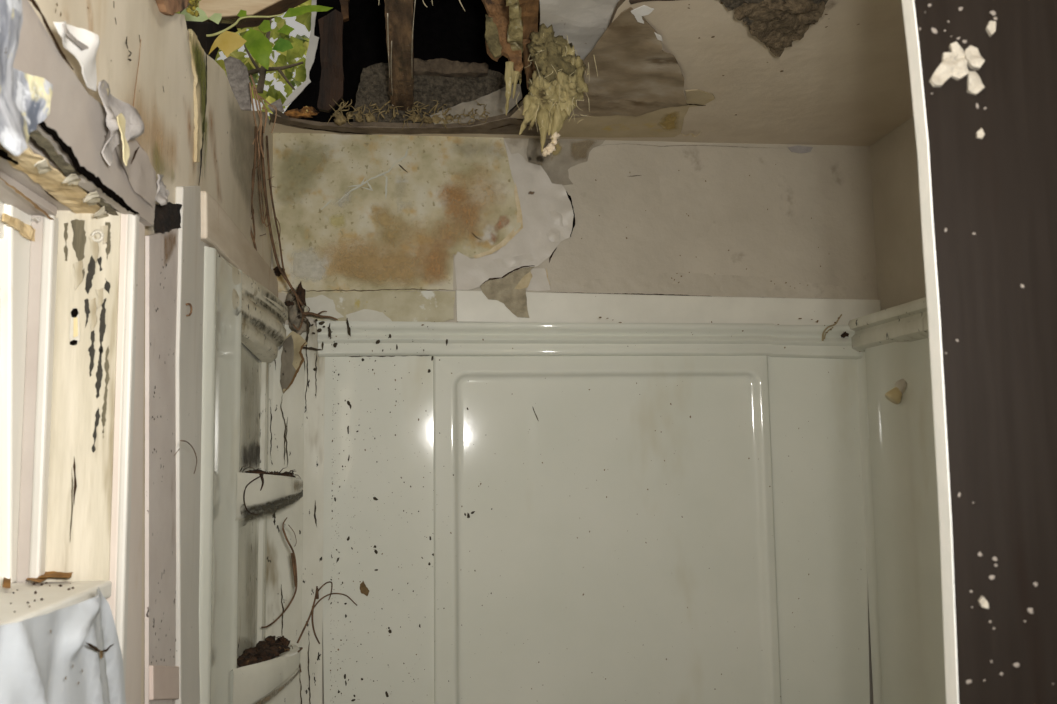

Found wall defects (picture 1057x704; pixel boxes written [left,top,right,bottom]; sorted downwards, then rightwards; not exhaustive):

crack [29,0,74,70]
peeling [53,21,145,166]
crack [133,40,141,107]
water stain [269,113,540,136]
water stain [558,89,715,138]
crack [0,177,55,221]
peeling [0,0,118,453]
crack [39,121,139,214]
spalling [154,174,182,234]
flaking render [272,133,605,322]